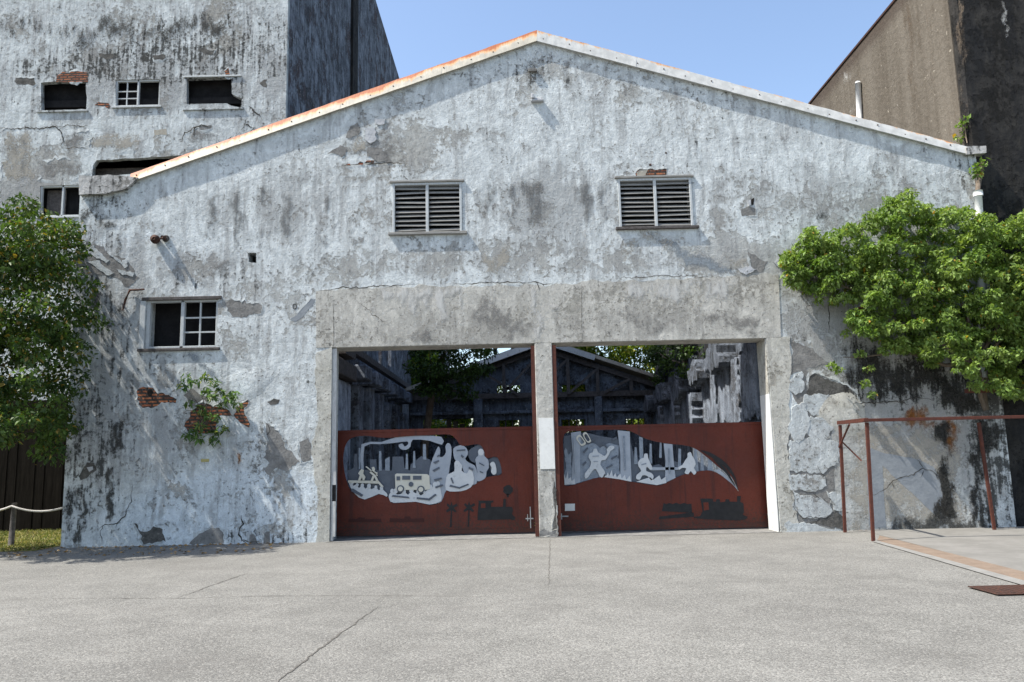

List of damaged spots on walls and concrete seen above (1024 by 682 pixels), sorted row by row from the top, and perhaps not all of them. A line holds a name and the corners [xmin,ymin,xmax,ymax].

water stain [6,14,231,50]
peeling [328,119,392,162]
crack [455,280,547,288]
crack [621,273,706,281]
spalling [135,385,313,476]
peeling [784,340,863,532]
water stain [843,335,1004,530]
water stain [62,487,88,543]
water stain [105,467,116,520]
spalling [133,523,166,546]
spalling [189,526,226,545]
crack [875,460,939,495]